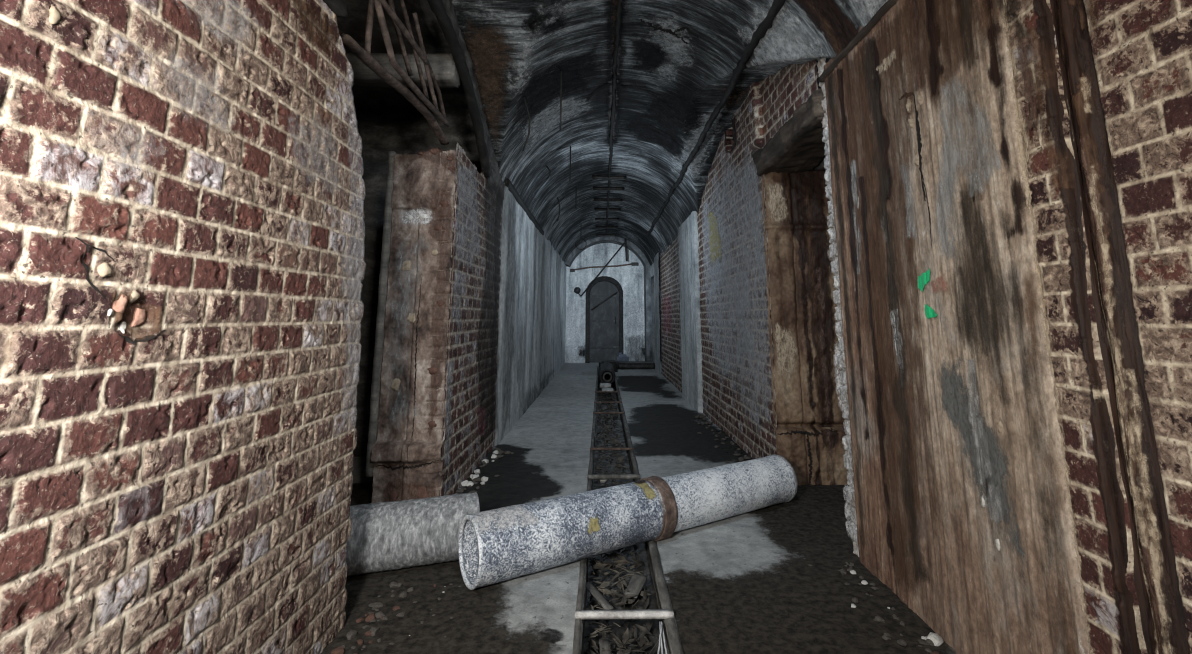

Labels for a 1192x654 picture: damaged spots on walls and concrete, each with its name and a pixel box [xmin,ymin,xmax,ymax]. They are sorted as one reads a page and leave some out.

water stain [466,26,513,145]
water stain [523,12,564,29]
water stain [518,71,588,114]
water stain [632,41,665,68]
water stain [627,124,682,154]
spalling [97,262,112,278]
spalling [108,290,162,339]
water stain [460,182,562,512]
water stain [937,83,1025,557]
water stain [997,0,1092,653]
water stain [617,375,753,463]
water stain [664,130,956,654]